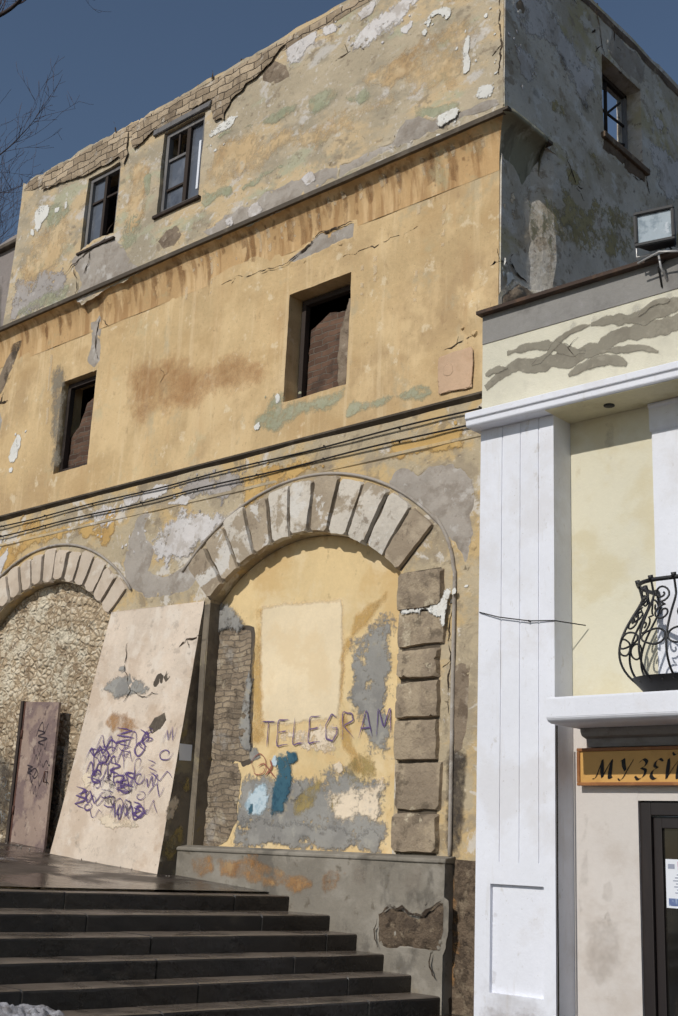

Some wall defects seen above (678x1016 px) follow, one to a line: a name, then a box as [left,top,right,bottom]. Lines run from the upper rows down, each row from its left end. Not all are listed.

peeling [348,0,451,51]
crack [492,0,503,74]
flaking render [10,21,504,320]
crack [223,221,352,284]
spalling [0,347,20,397]
peeling [254,386,431,431]
peeling [8,430,27,473]
spalling [0,461,324,603]
spalling [122,627,173,701]
spalling [145,708,170,739]
peeling [271,724,374,775]
spalling [373,896,449,957]